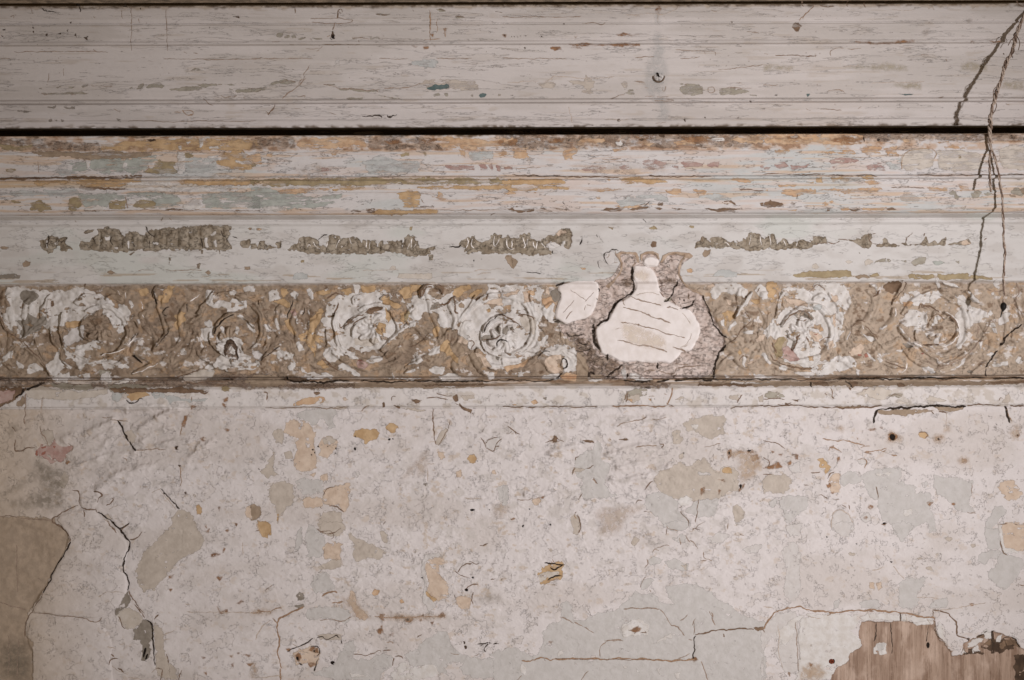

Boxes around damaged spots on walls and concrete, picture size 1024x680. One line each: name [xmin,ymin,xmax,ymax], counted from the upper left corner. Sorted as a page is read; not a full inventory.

crack [152,488,180,510]
peeling [0,132,1024,623]
crack [545,435,628,443]
crack [588,256,1024,466]
flaking render [0,515,70,680]
crack [24,505,142,663]
crack [108,644,156,680]
peeling [115,509,204,680]
peeling [489,583,944,680]
crack [518,521,984,680]
spalling [962,629,1020,654]